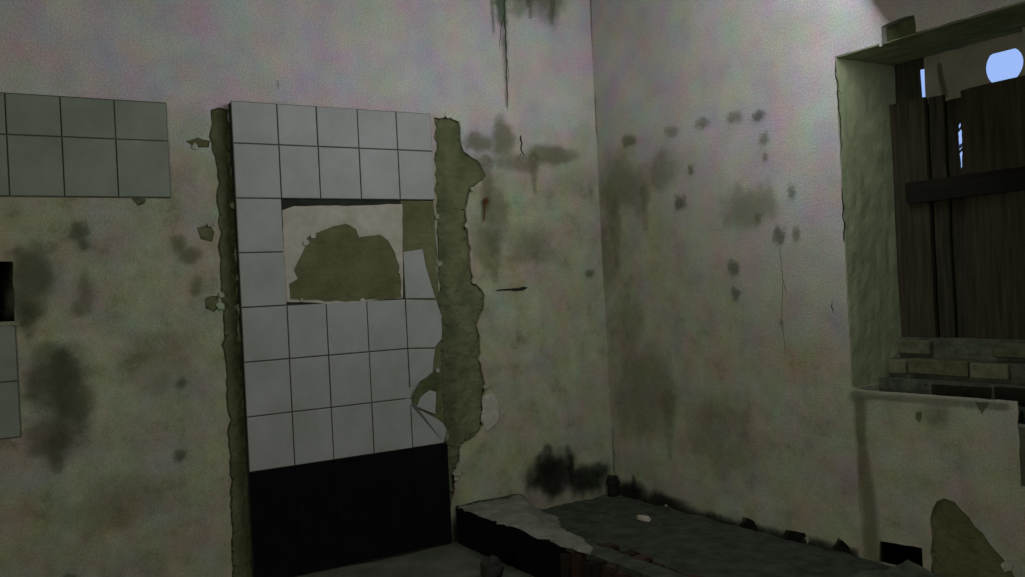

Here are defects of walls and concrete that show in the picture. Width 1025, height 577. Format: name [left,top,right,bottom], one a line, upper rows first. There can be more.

water stain [497,0,506,25]
peeling [186,108,252,577]
peeling [289,112,500,499]
water stain [527,445,607,497]
water stain [618,477,857,557]
peeling [932,499,1015,577]